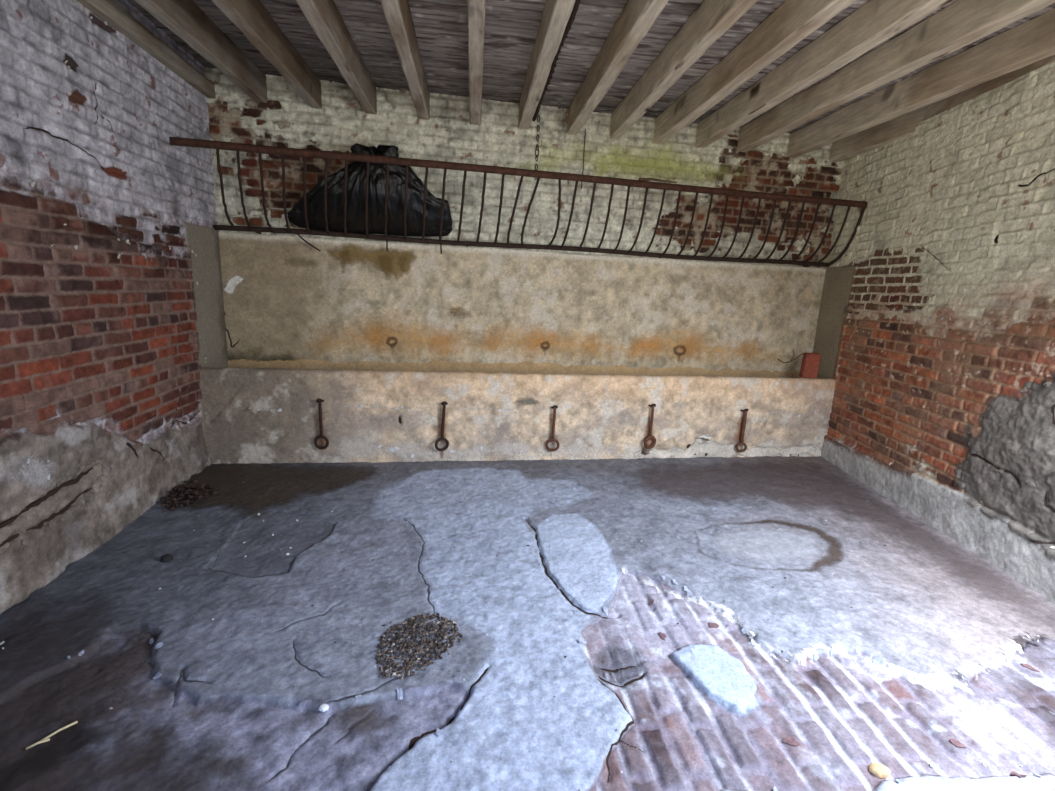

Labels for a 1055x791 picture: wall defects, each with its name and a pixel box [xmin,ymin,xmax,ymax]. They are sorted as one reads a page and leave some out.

peeling [0,177,207,448]
peeling [101,165,127,180]
leakage [328,246,414,276]
peeling [652,134,843,267]
peeling [634,248,1055,488]
crack [1017,168,1055,187]
crack [0,467,93,547]
crack [525,519,608,619]
leakage [644,464,1026,605]
leakage [0,607,212,791]
spalling [578,571,1055,791]